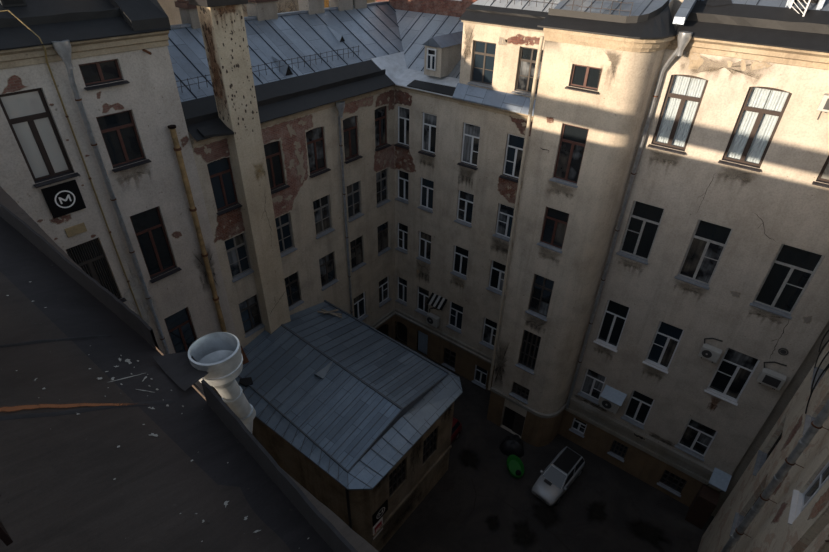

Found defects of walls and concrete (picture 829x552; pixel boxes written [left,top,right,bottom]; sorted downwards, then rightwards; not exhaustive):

flaking render [1,75,28,94]
flaking render [180,6,313,218]
flaking render [343,89,412,114]
flaking render [497,177,522,205]